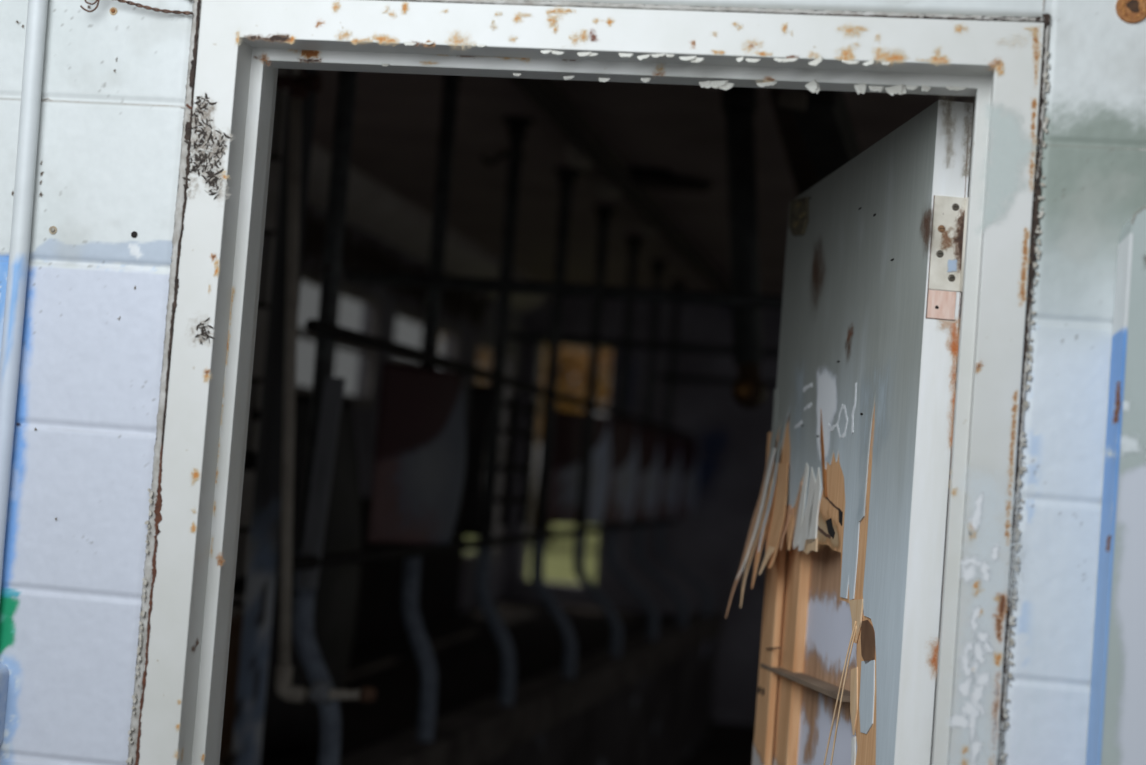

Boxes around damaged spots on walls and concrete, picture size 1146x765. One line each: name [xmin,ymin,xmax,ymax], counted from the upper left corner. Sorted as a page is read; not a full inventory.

corrosion [334,28,542,66]
corrosion [488,6,614,61]
corrosion [733,21,820,60]